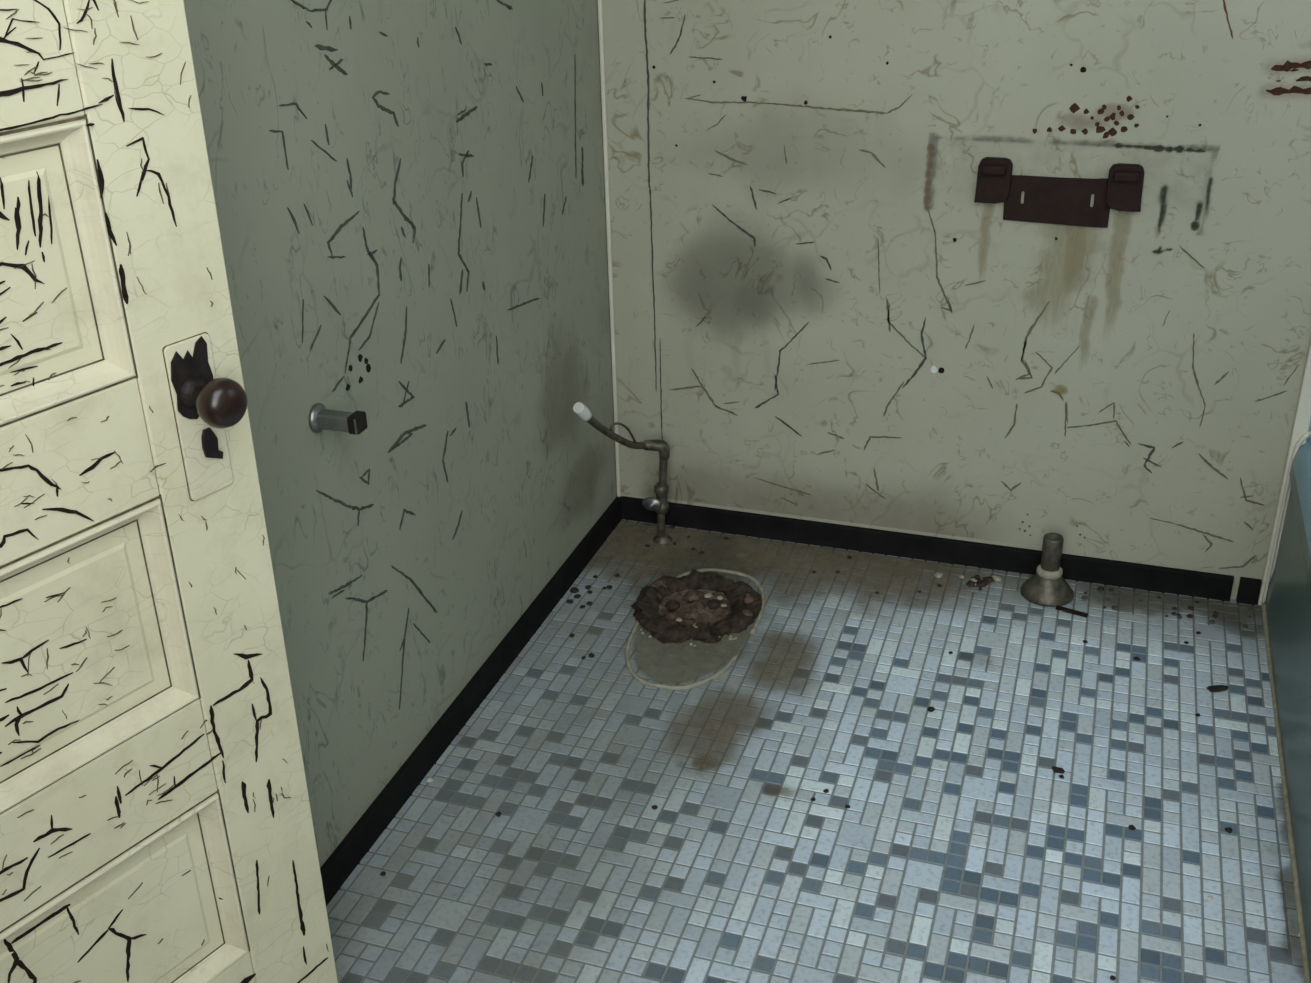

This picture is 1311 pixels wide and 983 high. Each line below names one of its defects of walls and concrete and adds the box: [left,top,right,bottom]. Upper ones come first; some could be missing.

crack [291,0,419,75]
crack [455,27,493,66]
crack [1223,0,1233,38]
crack [372,90,399,127]
crack [528,57,584,227]
rust [1032,96,1140,139]
crack [643,0,986,499]
crack [1180,247,1204,268]
crack [269,102,540,530]
crack [1255,364,1299,402]
crack [987,301,1265,569]
damp [677,698,755,769]